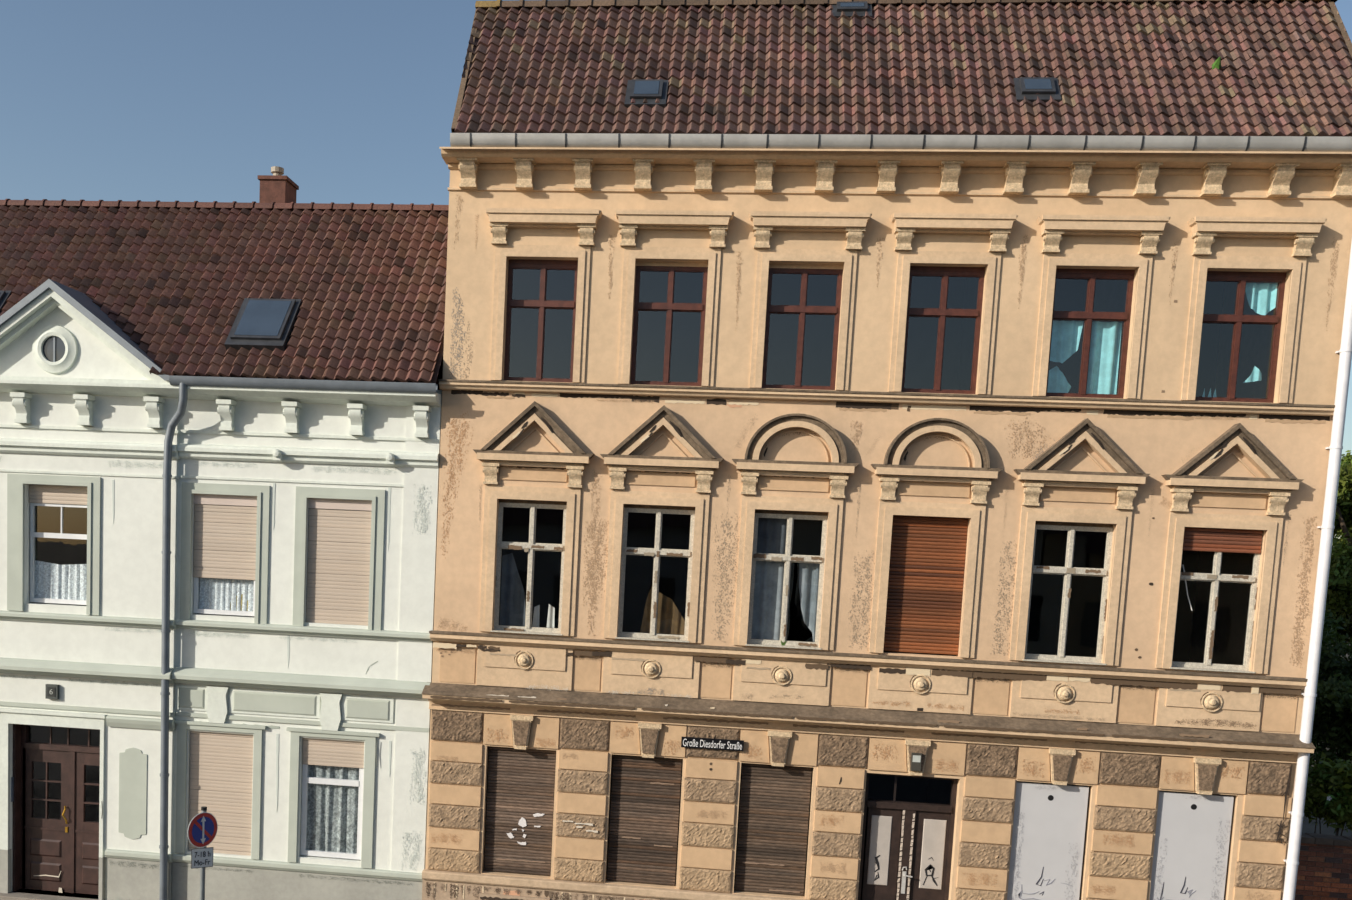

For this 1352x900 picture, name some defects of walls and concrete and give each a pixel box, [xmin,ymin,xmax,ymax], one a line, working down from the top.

leakage [449,287,473,380]
leakage [582,468,609,636]